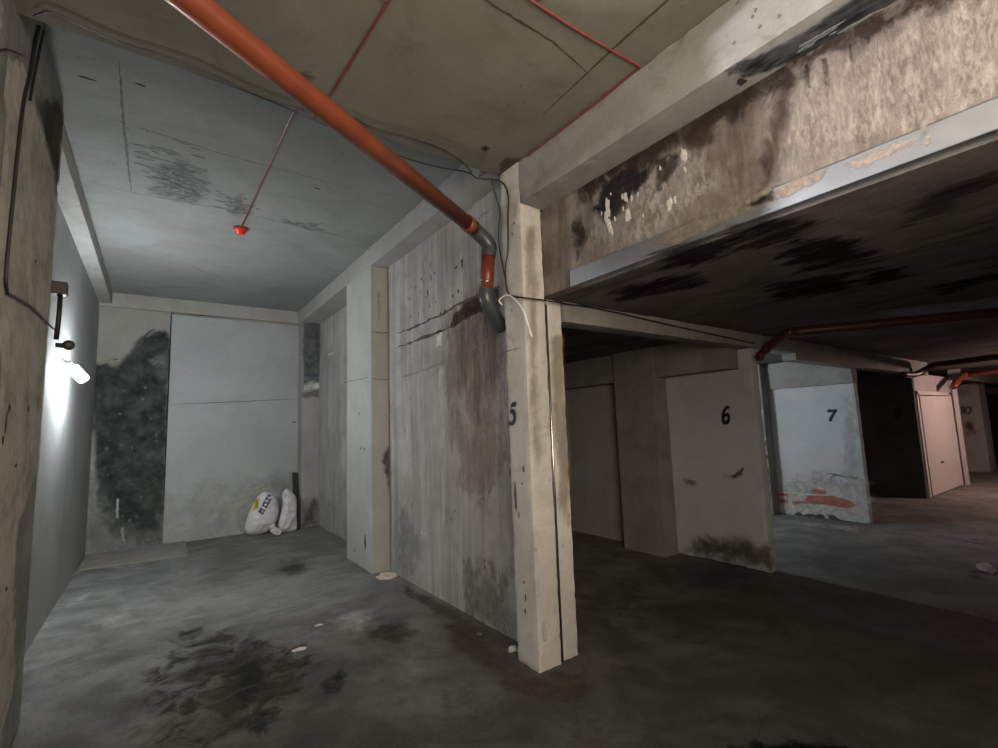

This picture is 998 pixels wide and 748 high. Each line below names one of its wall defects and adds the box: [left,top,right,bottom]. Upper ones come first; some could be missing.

water stain [578,0,952,221]
water stain [572,221,586,256]
flaking render [601,192,644,235]
water stain [610,217,914,302]
water stain [903,173,998,227]
crack [371,287,499,348]
water stain [86,328,170,551]
flaking render [778,475,865,521]